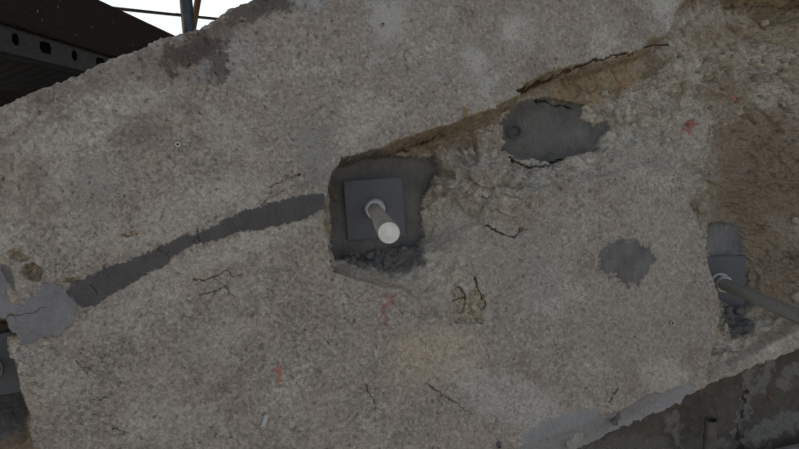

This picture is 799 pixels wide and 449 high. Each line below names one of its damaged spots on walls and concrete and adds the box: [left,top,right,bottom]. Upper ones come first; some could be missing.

crack [516,52,633,109]
spalling [322,0,799,328]
spalling [6,249,44,283]
crack [192,270,233,298]
spalling [706,297,799,383]
spalling [0,319,35,449]